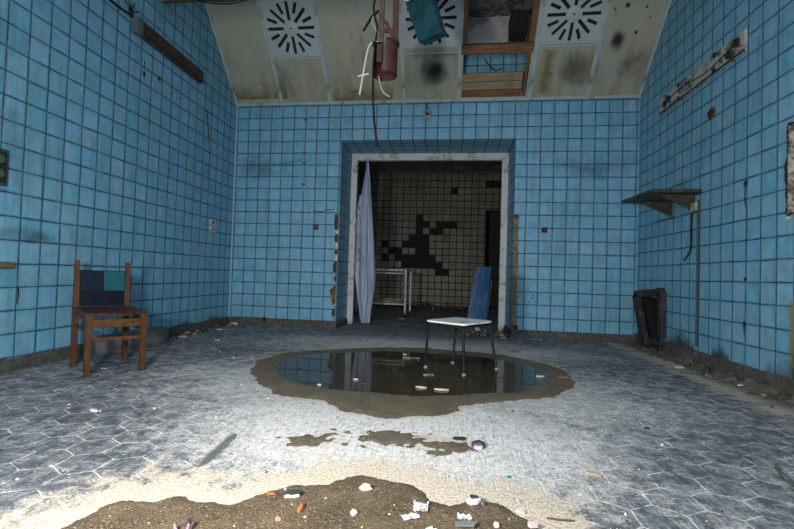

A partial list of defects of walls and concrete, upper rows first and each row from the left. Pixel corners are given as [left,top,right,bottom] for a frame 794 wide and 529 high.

leakage [426,63,442,81]
spalling [784,122,794,220]